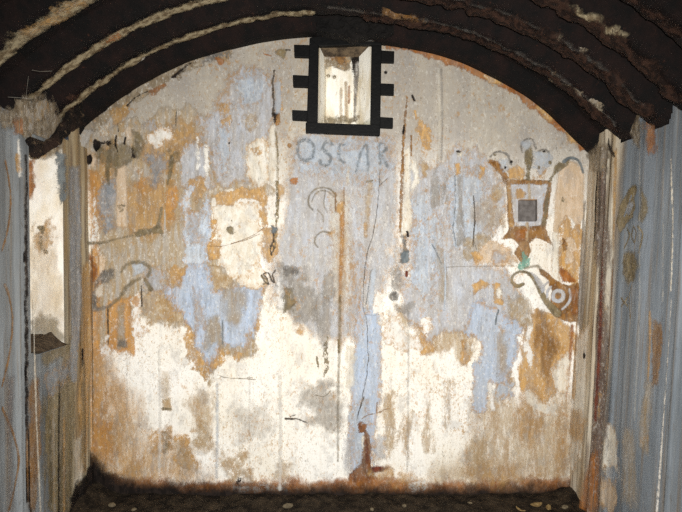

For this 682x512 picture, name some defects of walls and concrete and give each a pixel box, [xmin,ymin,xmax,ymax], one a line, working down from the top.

water stain [275,263,335,346]
peeling [68,45,594,475]
rust [327,192,345,301]
water stain [42,337,570,512]
rust [93,357,571,492]